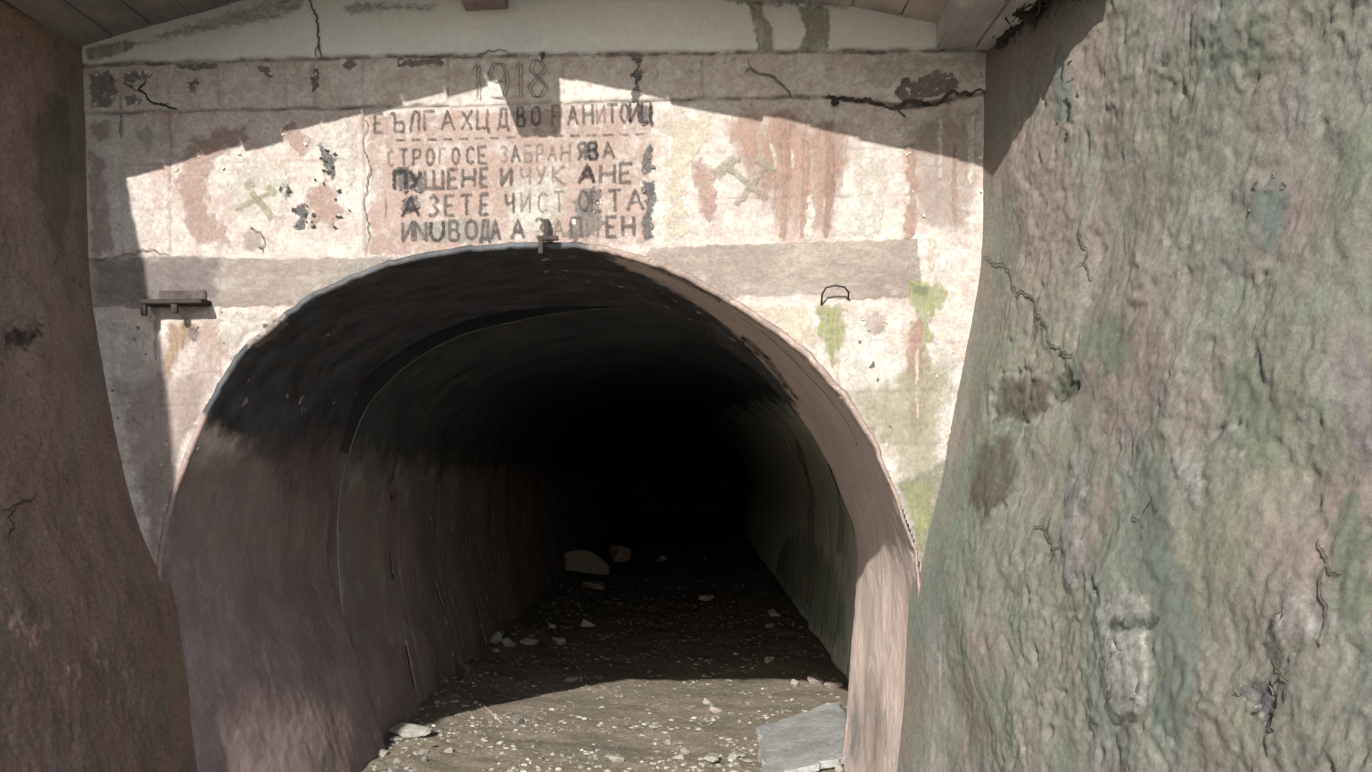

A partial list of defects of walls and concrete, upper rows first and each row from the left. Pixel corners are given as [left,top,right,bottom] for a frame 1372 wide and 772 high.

crack [308,0,323,59]
peeling [89,67,150,141]
crack [119,74,177,135]
crack [745,59,986,117]
peeling [279,122,350,230]
crack [1076,225,1093,279]
crack [983,256,1073,374]
damp [108,317,386,772]
damp [589,244,955,772]